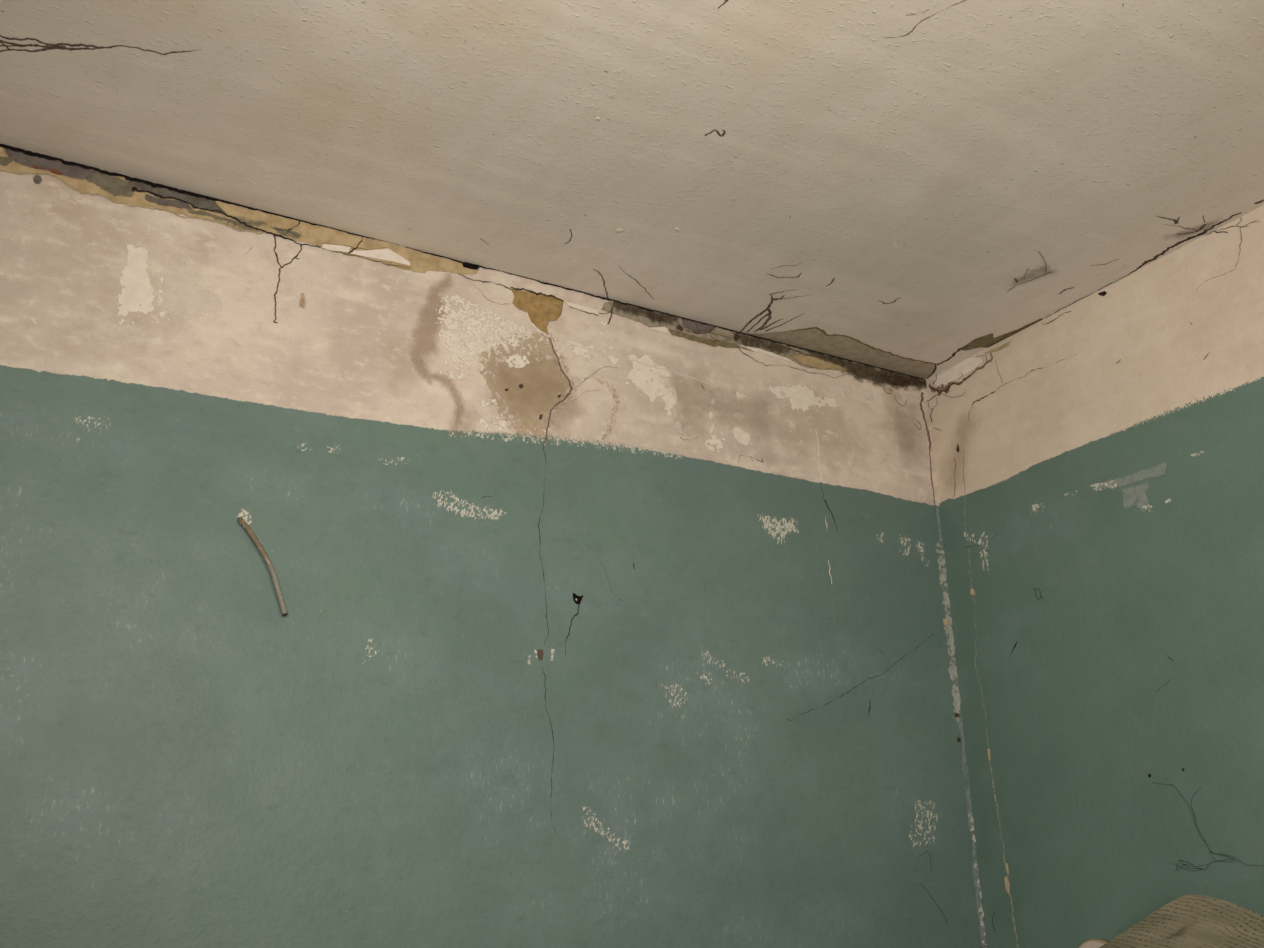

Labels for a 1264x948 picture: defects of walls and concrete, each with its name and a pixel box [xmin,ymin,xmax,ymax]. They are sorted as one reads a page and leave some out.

crack [0,35,202,55]
crack [884,0,966,38]
peeling [72,244,216,340]
flaking render [0,147,480,275]
crack [1036,200,1264,325]
water stain [481,333,574,438]
flaking render [436,287,1042,453]
crack [0,144,1078,948]
peeling [1064,480,1171,512]